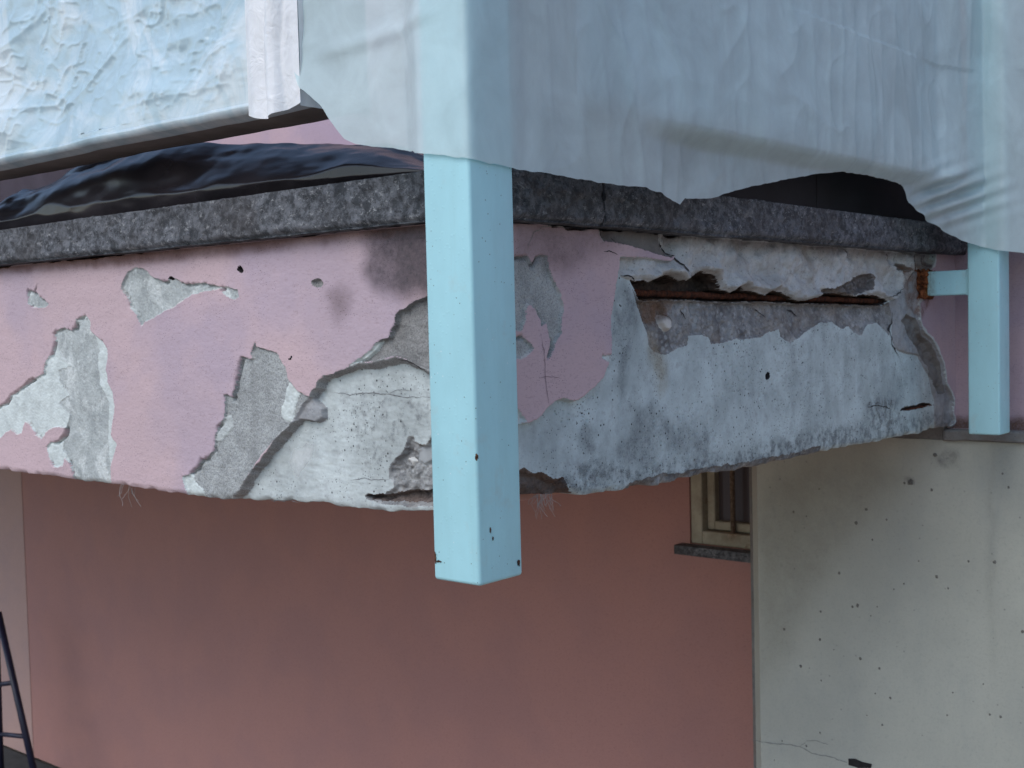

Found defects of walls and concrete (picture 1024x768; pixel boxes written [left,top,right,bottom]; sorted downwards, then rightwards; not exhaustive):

peeling [0,315,117,483]
peeling [121,267,239,326]
spalling [182,296,433,512]
spalling [600,231,673,258]
spalling [514,254,956,495]